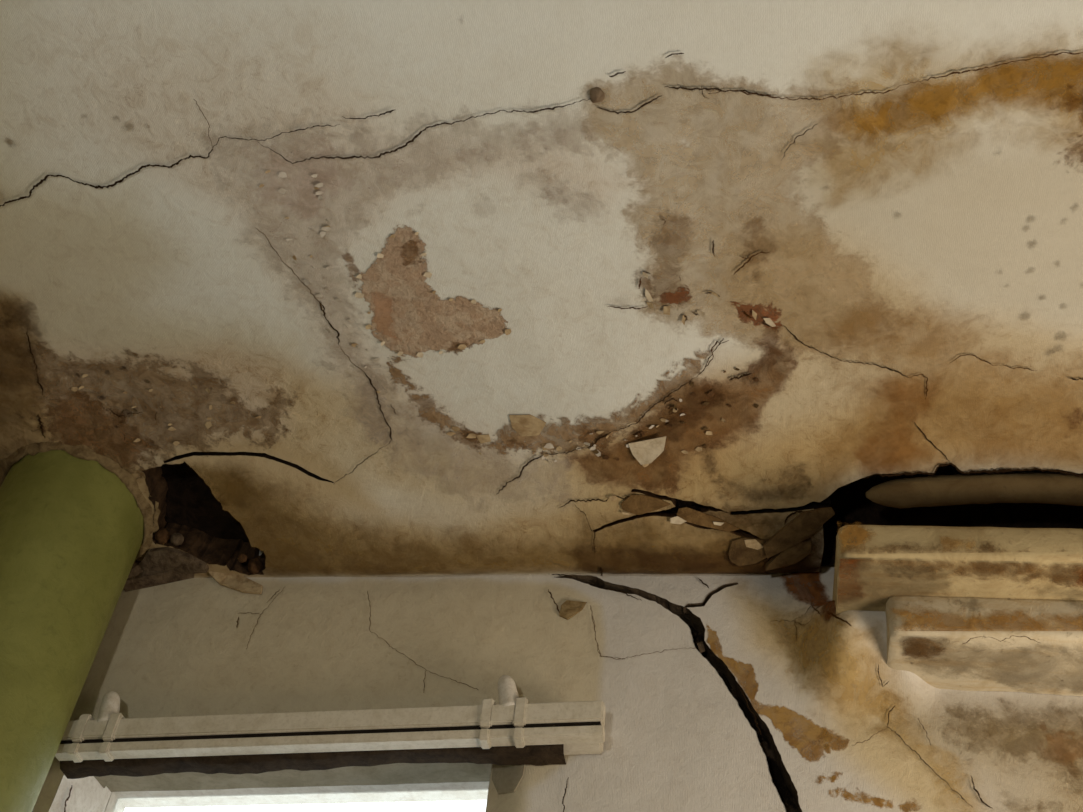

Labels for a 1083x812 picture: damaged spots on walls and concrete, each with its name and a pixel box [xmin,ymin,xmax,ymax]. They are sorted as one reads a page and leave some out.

crack [0,52,1083,206]
corrosion [829,55,1083,192]
crack [164,228,396,483]
peeling [343,225,511,368]
leakage [387,75,884,493]
peeling [626,381,715,467]
spalling [123,460,266,594]
leakage [209,472,824,575]
spalling [559,489,835,571]
leakage [837,525,1083,602]
crack [552,574,802,812]
leakage [893,609,1083,659]